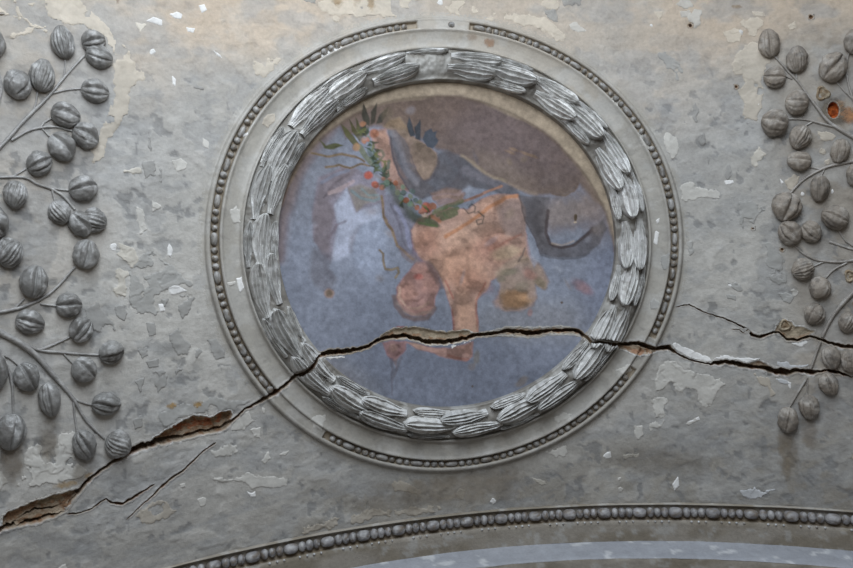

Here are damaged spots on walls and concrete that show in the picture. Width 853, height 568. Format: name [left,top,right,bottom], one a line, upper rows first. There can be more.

peeling [723,11,771,121]
rust [821,99,853,122]
peeling [84,243,195,336]
peeling [135,328,225,393]
peeling [672,342,809,368]
peeling [0,431,87,529]
flaking render [151,409,261,440]
crack [0,302,853,536]
peeling [549,445,568,458]
peeling [634,361,726,440]